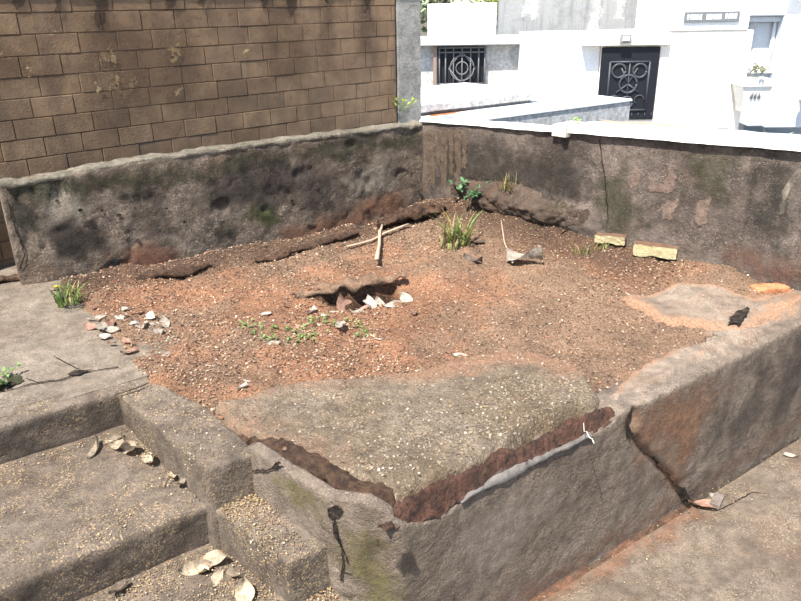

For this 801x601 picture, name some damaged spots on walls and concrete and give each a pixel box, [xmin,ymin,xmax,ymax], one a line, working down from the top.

leakage [13,197,38,242]
leakage [50,226,107,260]
leakage [758,169,801,229]
spalling [728,307,750,324]
crack [0,356,117,391]
spalling [377,407,615,532]
crack [625,420,700,507]
crack [327,505,351,581]